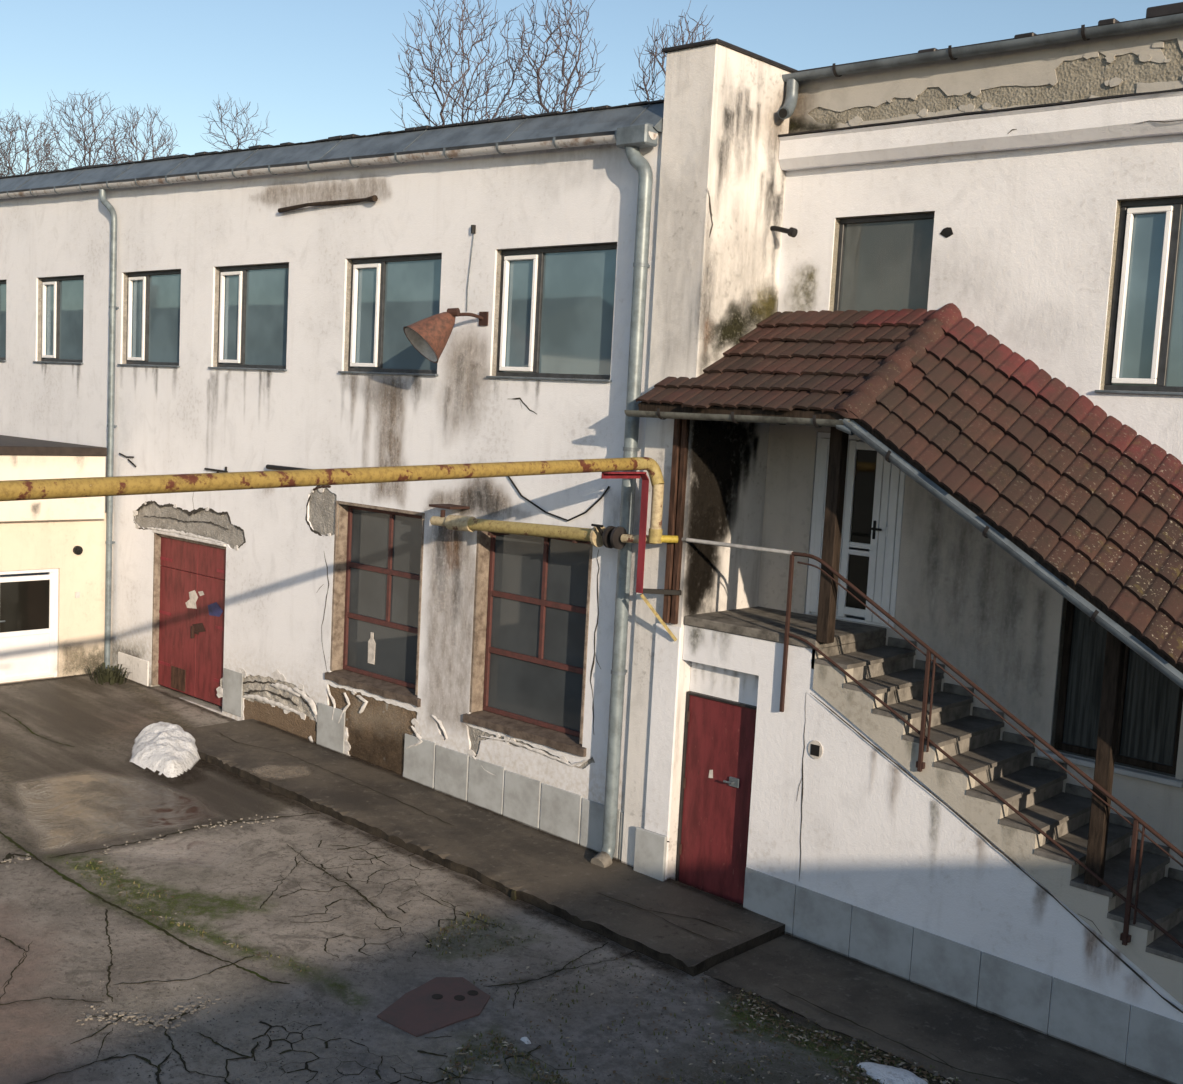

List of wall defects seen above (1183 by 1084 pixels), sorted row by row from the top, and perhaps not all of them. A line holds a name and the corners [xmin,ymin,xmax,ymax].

flaking render [808,39,1183,126]
damp [367,379,402,467]
spalling [133,500,246,551]
spalling [305,485,340,536]
damp [685,420,758,615]
spalling [236,668,424,775]
flaking render [432,715,448,740]
spalling [467,726,595,775]
crack [274,832,478,965]
crack [252,1021,575,1084]